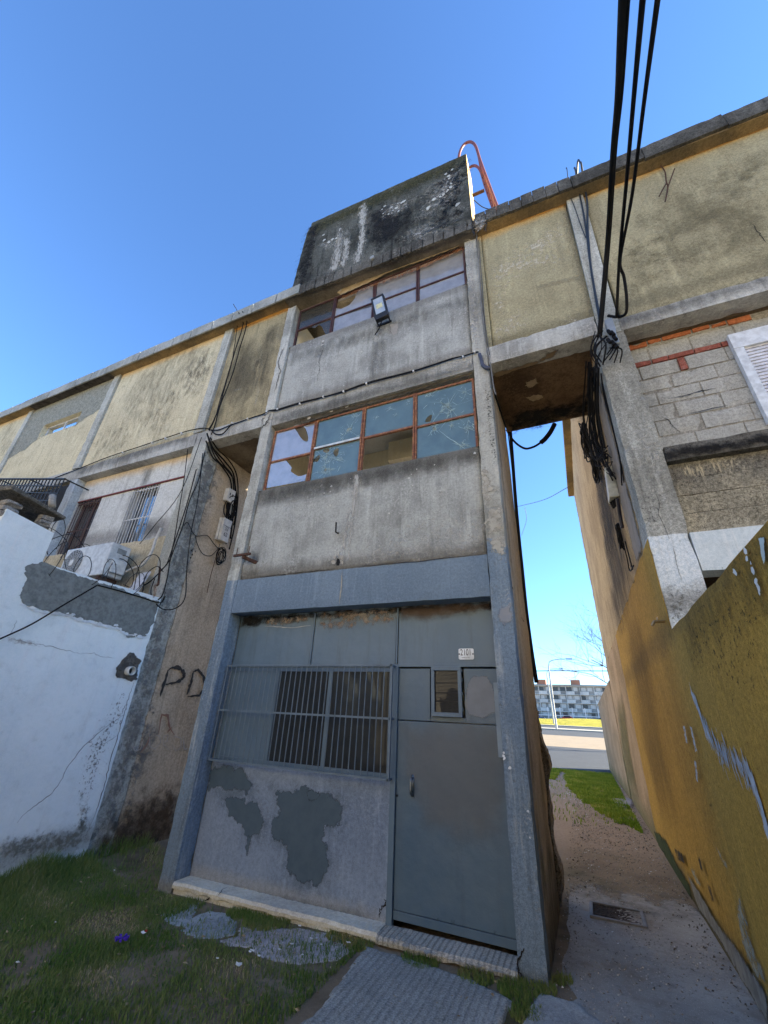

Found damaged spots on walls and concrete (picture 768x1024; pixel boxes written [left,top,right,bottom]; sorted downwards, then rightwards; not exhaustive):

damp [295,224,319,284]
damp [330,203,421,271]
peeling [19,562,159,638]
rust [321,604,484,628]
damp [3,452,216,857]
spalling [116,652,141,682]
crack [17,683,134,835]
peeling [689,684,768,839]